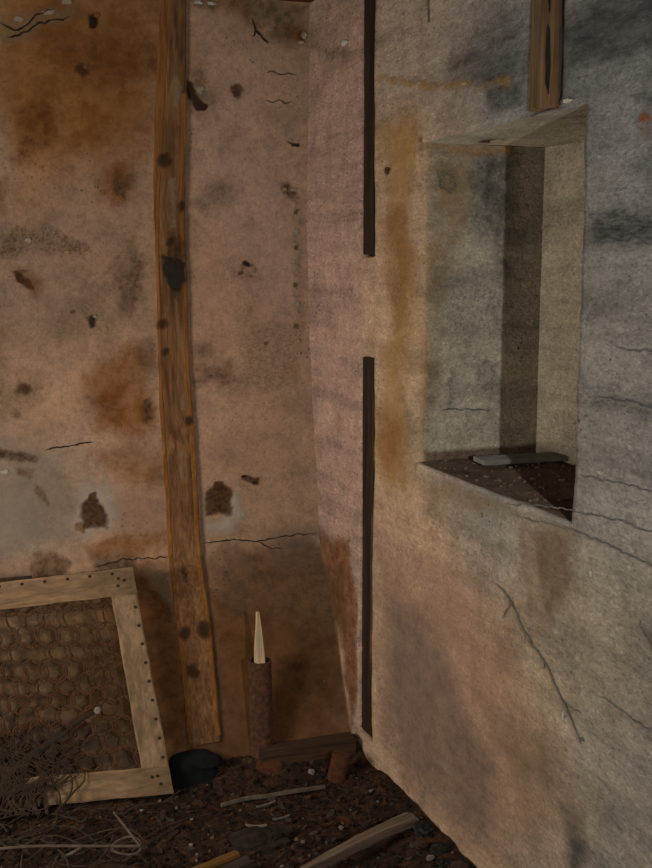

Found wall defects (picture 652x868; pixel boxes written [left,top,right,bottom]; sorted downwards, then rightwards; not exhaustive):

crack [251,18,268,43]
spalling [187,81,208,111]
crack [595,391,652,412]
crack [47,442,92,450]
crack [582,475,652,492]
crack [202,532,318,549]
crack [507,502,652,566]
crack [98,556,169,567]
crack [496,584,584,743]
crack [600,696,652,731]